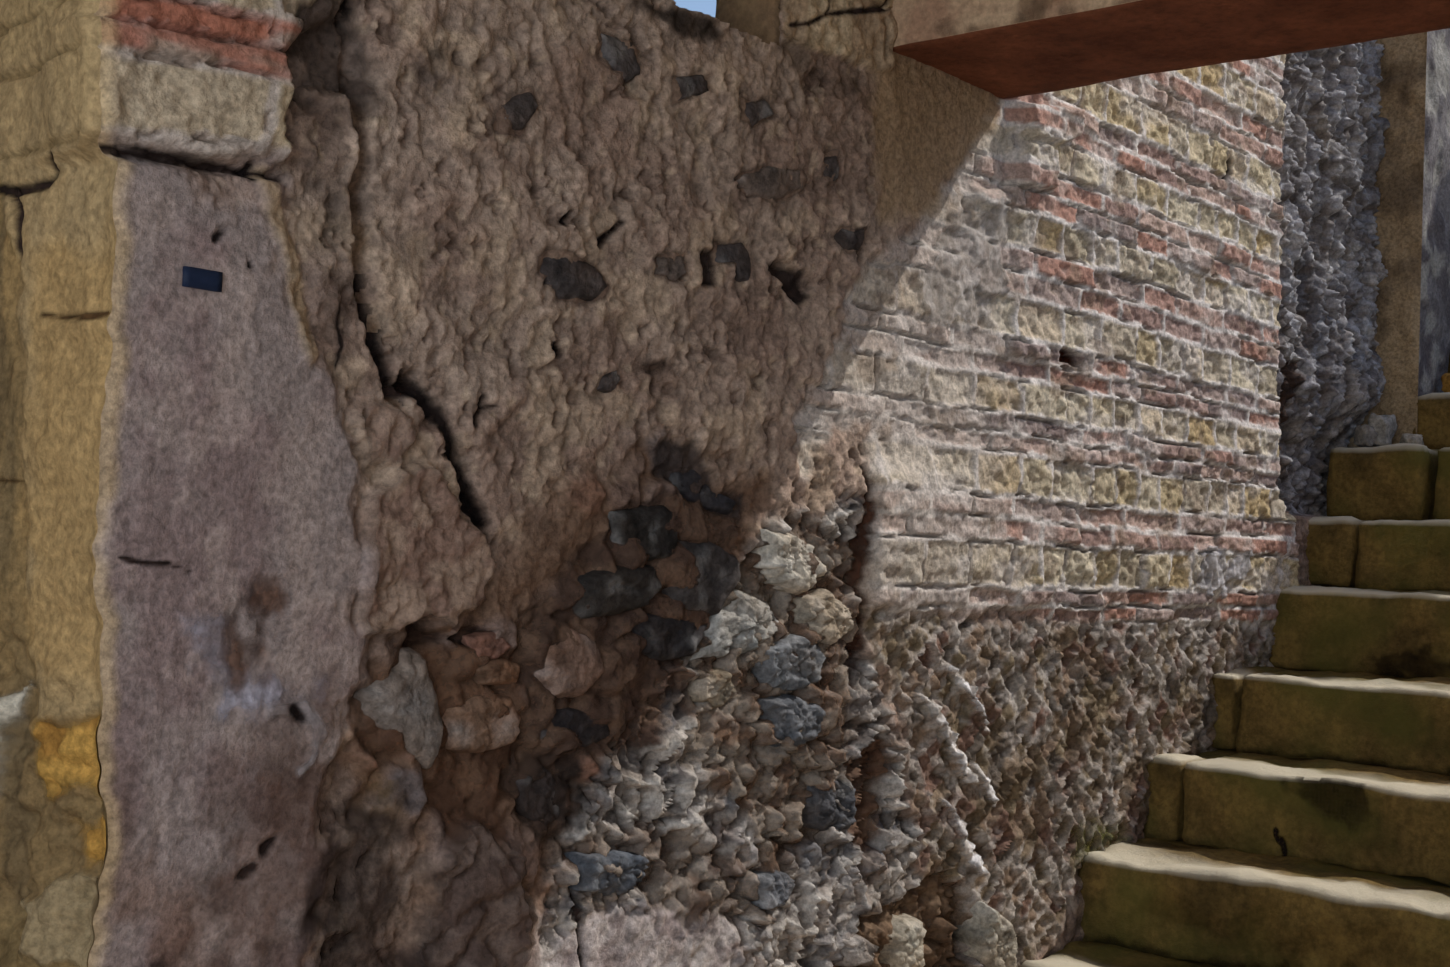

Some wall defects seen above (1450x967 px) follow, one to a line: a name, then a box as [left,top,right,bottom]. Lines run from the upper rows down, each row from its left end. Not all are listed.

crack [334,0,351,25]
crack [790,0,888,27]
crack [335,274,486,528]
flaking render [1196,546,1253,598]
spalling [353,440,889,920]
spalling [833,865,1018,967]